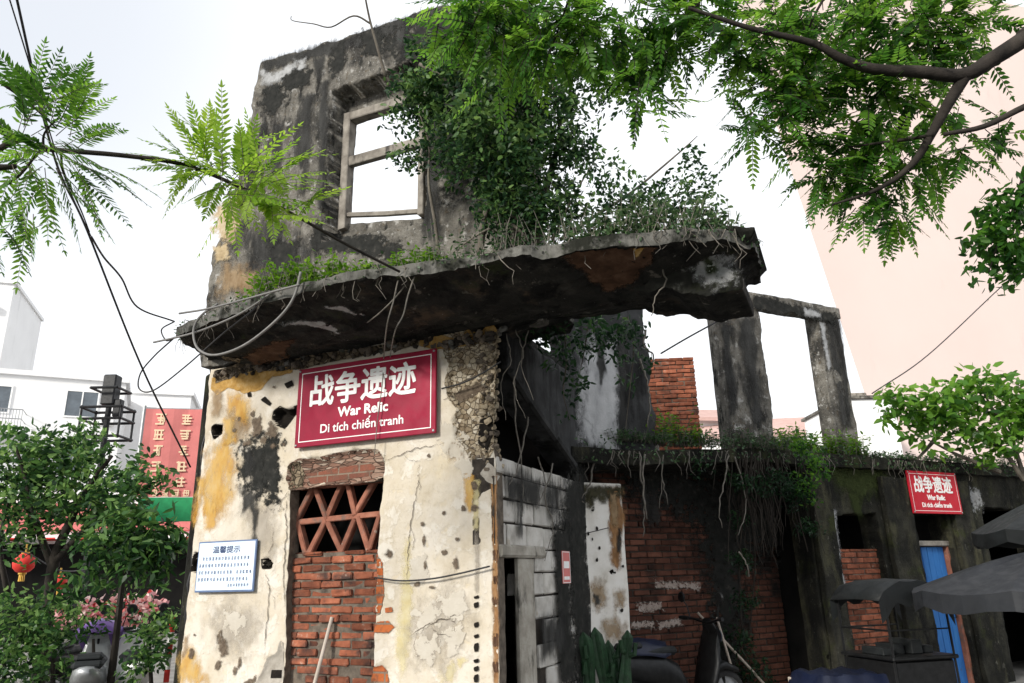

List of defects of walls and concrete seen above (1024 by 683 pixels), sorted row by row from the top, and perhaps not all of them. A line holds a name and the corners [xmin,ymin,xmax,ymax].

damp [219,3,476,292]
spalling [211,325,501,490]
damp [597,329,628,438]
damp [722,295,853,429]
damp [192,409,287,554]
spalling [371,665,389,683]
crack [388,445,434,572]
crack [413,544,479,682]
damp [504,440,680,683]